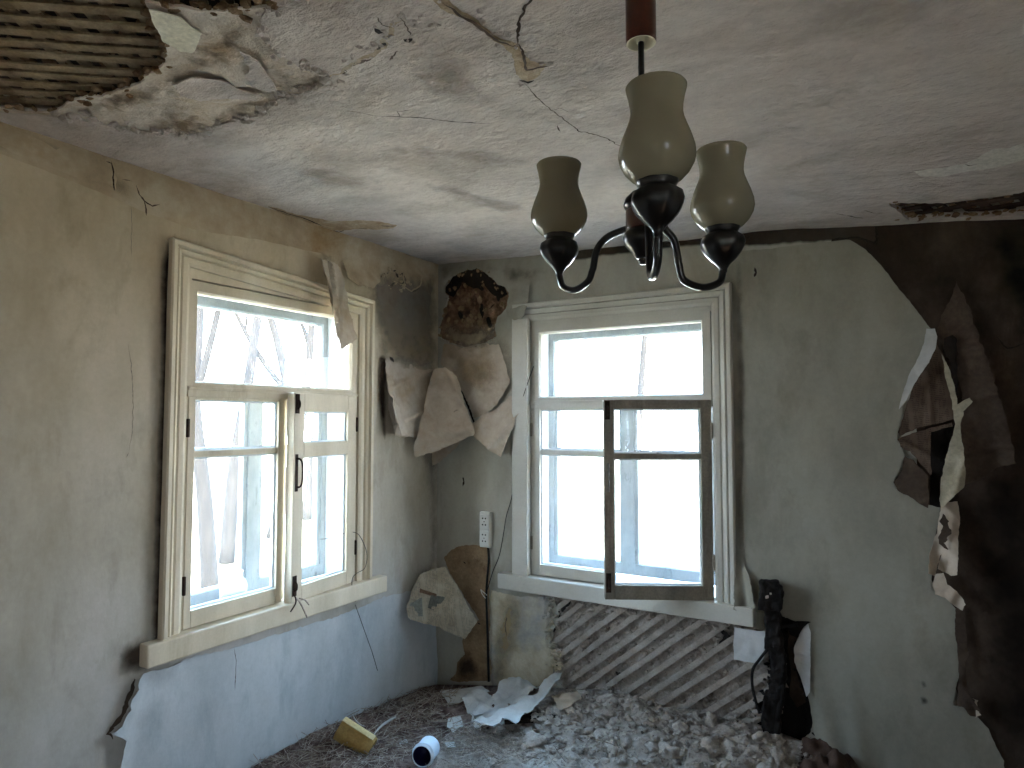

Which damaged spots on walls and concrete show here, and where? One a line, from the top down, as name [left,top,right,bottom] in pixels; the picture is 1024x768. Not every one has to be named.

spalling [0,0,345,142]
crack [526,85,620,146]
crack [106,161,160,255]
spalling [889,192,1024,221]
spalling [438,268,509,347]
spalling [538,595,771,724]